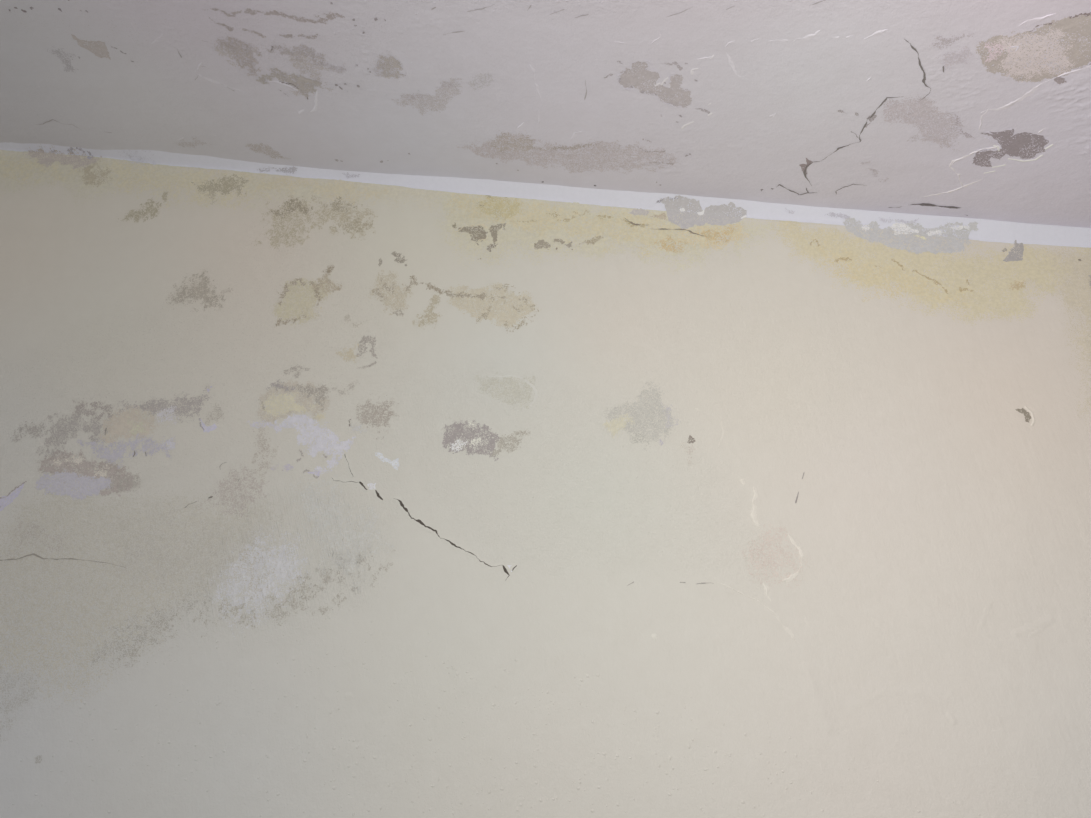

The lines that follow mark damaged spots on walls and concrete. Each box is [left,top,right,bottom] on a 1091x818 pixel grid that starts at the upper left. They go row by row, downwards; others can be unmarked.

peeling [209,2,406,114]
peeling [604,60,713,129]
crack [778,40,944,195]
peeling [919,13,1091,198]
crack [888,203,968,216]
peeling [248,412,365,478]
peeling [442,420,531,461]
crack [329,453,519,582]
crack [0,553,122,567]